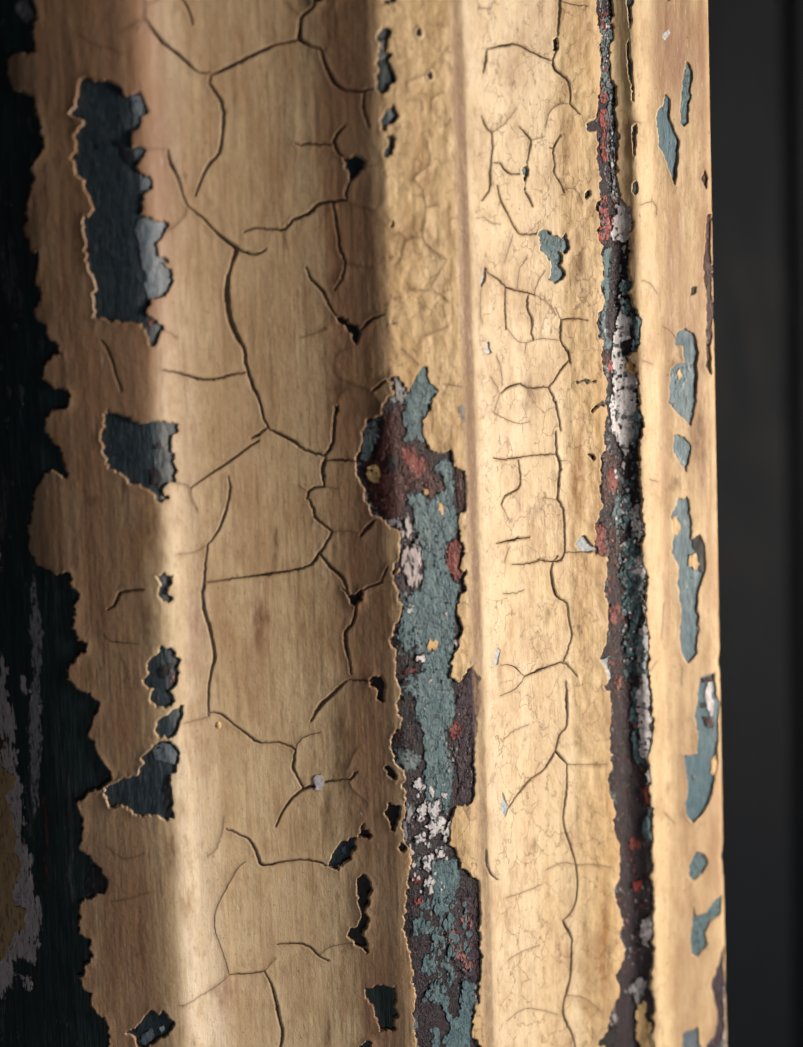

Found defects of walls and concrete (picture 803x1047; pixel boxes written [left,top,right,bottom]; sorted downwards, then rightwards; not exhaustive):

peeling [656,62,692,183]
peeling [0,0,183,1047]
crack [80,0,449,825]
crack [480,0,609,1047]
peeling [538,230,568,283]
peeling [575,0,655,1047]
peeling [671,497,705,662]
peeling [668,214,714,425]
peeling [356,367,482,1047]
peeling [684,674,720,821]
crack [182,819,353,1046]
peeling [682,949,726,1047]